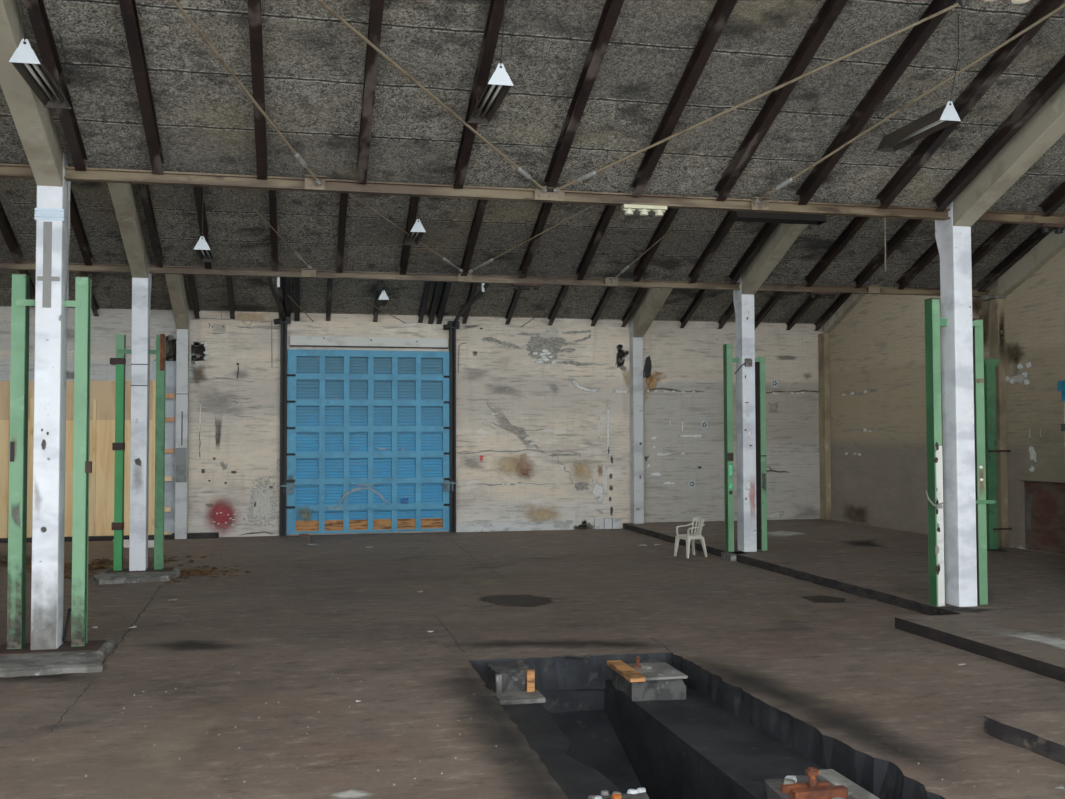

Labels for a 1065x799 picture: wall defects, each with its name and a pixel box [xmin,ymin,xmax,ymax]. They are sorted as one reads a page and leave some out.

peeling [482,330,594,366]